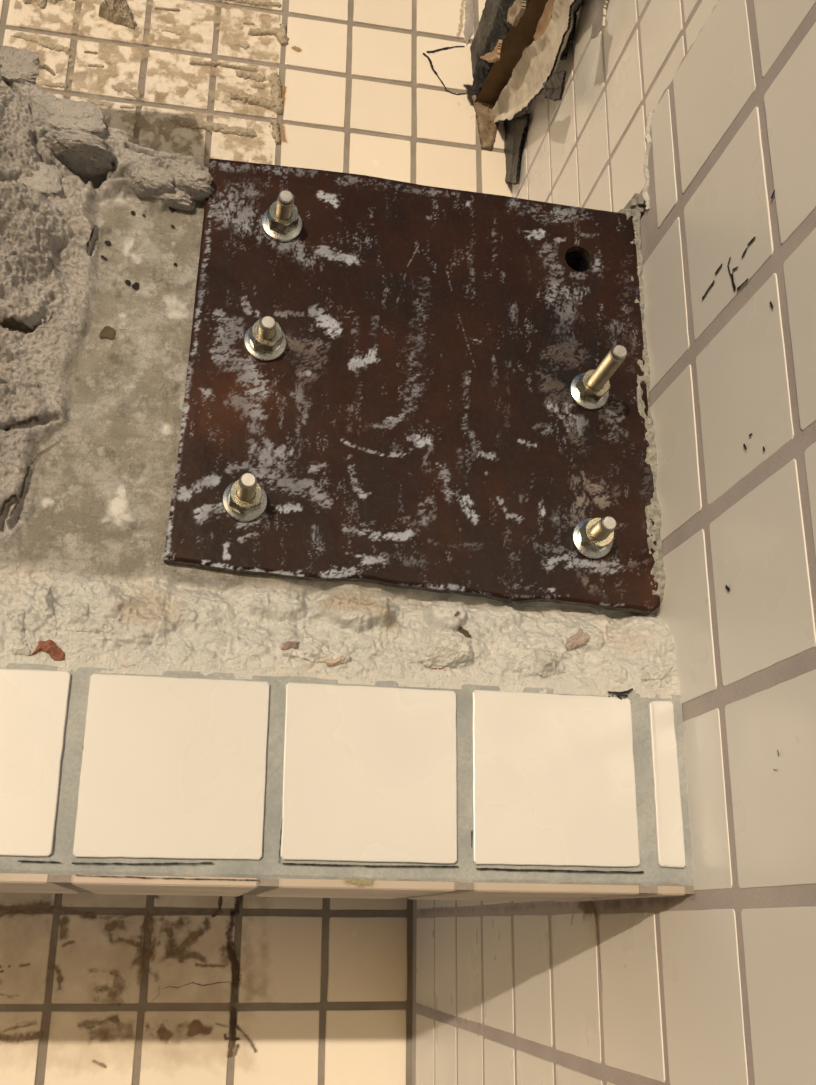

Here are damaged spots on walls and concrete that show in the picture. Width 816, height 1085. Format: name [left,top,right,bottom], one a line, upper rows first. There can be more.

spalling [457,0,474,45]
peeling [507,0,526,26]
peeling [480,40,502,63]
spalling [471,94,499,151]
spalling [643,113,653,210]
crack [4,416,38,431]
crack [0,441,58,516]
leakage [0,903,96,939]
leakage [105,895,241,991]
leakage [0,1025,43,1042]
leakage [78,1016,132,1040]
leakage [224,1008,256,1057]